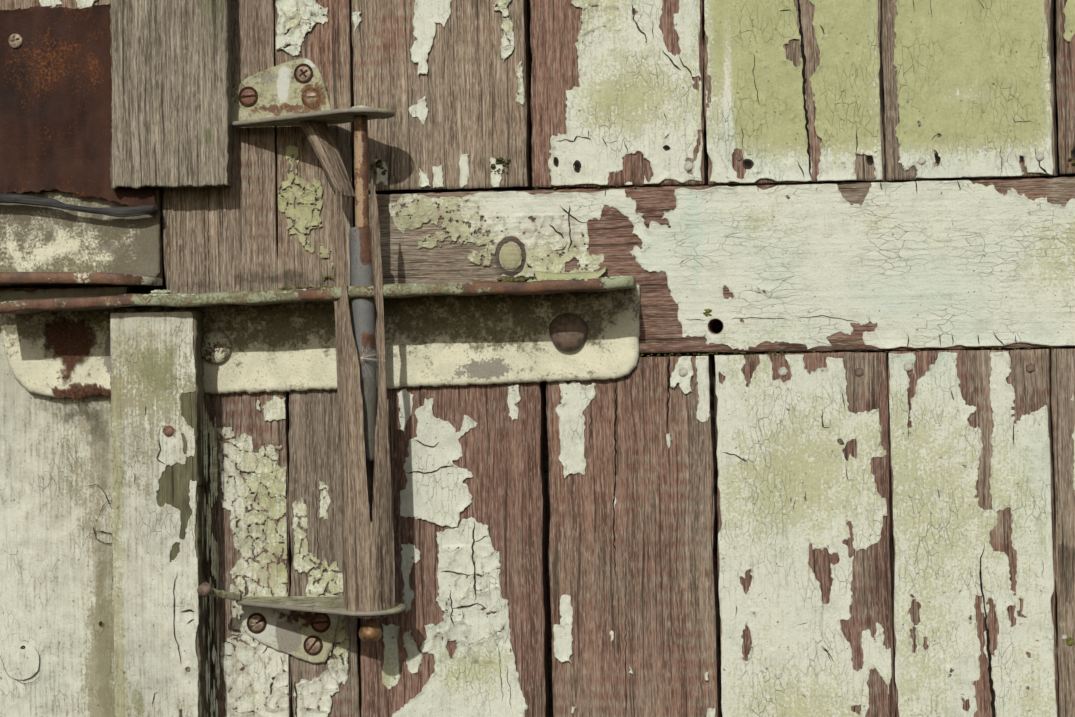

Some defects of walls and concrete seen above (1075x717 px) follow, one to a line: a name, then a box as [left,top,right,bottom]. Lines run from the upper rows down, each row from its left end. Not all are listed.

peeling [276,0,328,56]
peeling [410,0,452,75]
peeling [493,0,525,106]
peeling [659,0,681,56]
peeling [837,0,919,205]
peeling [970,161,1075,207]
corrosion [43,317,111,402]
peeling [156,391,349,717]
peeling [382,384,528,717]
peeling [534,149,891,717]
peeling [956,351,1026,717]
peeling [1006,350,1075,717]